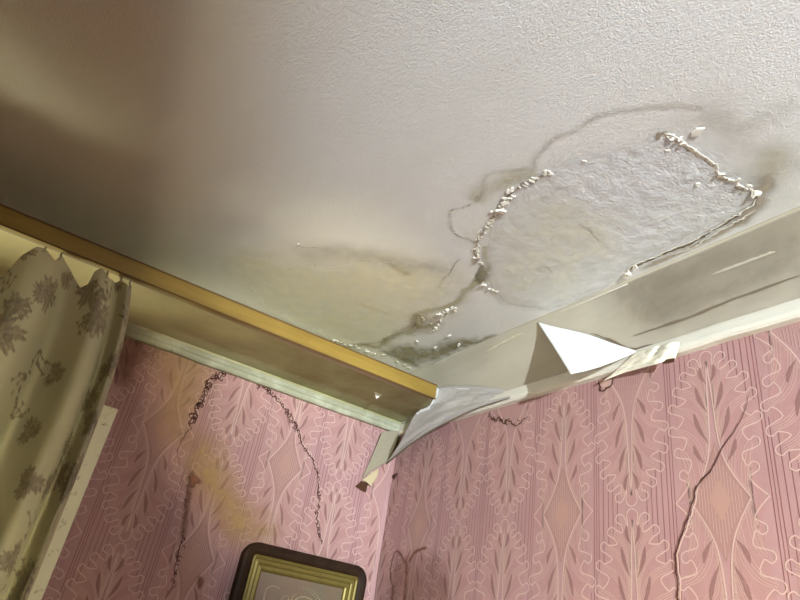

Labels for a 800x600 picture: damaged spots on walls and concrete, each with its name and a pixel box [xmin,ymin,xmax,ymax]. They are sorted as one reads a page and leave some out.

peeling [656,127,762,199]
leakage [640,180,800,309]
leakage [257,265,491,364]
crack [171,535,185,586]
crack [177,372,230,507]
crack [256,384,323,544]
peeling [362,431,400,486]
crack [674,394,749,600]